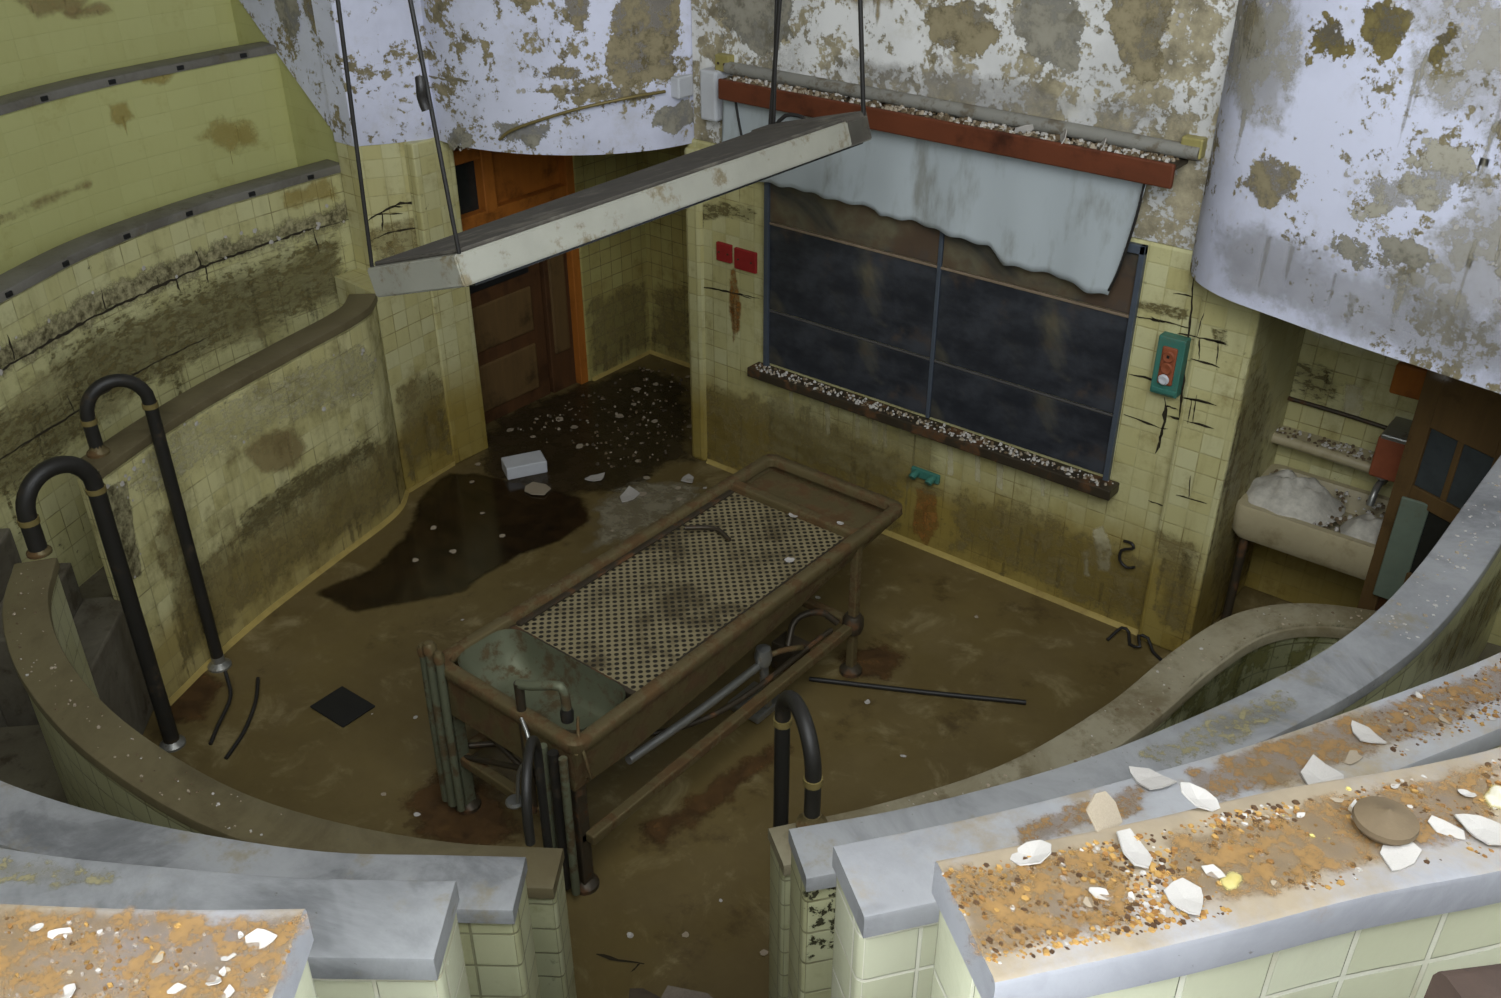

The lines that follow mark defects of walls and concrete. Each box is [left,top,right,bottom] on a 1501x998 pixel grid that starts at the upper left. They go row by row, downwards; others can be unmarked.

leakage [27,0,108,17]
peeling [516,0,694,137]
peeling [908,0,1184,98]
peeling [1299,0,1475,75]
peeling [1235,148,1308,209]
peeling [1323,113,1501,289]
crack [0,335,211,460]
leakage [0,240,341,533]
crack [2,201,415,371]
rust [729,270,741,341]
crack [1124,278,1226,454]
crack [1148,476,1207,506]